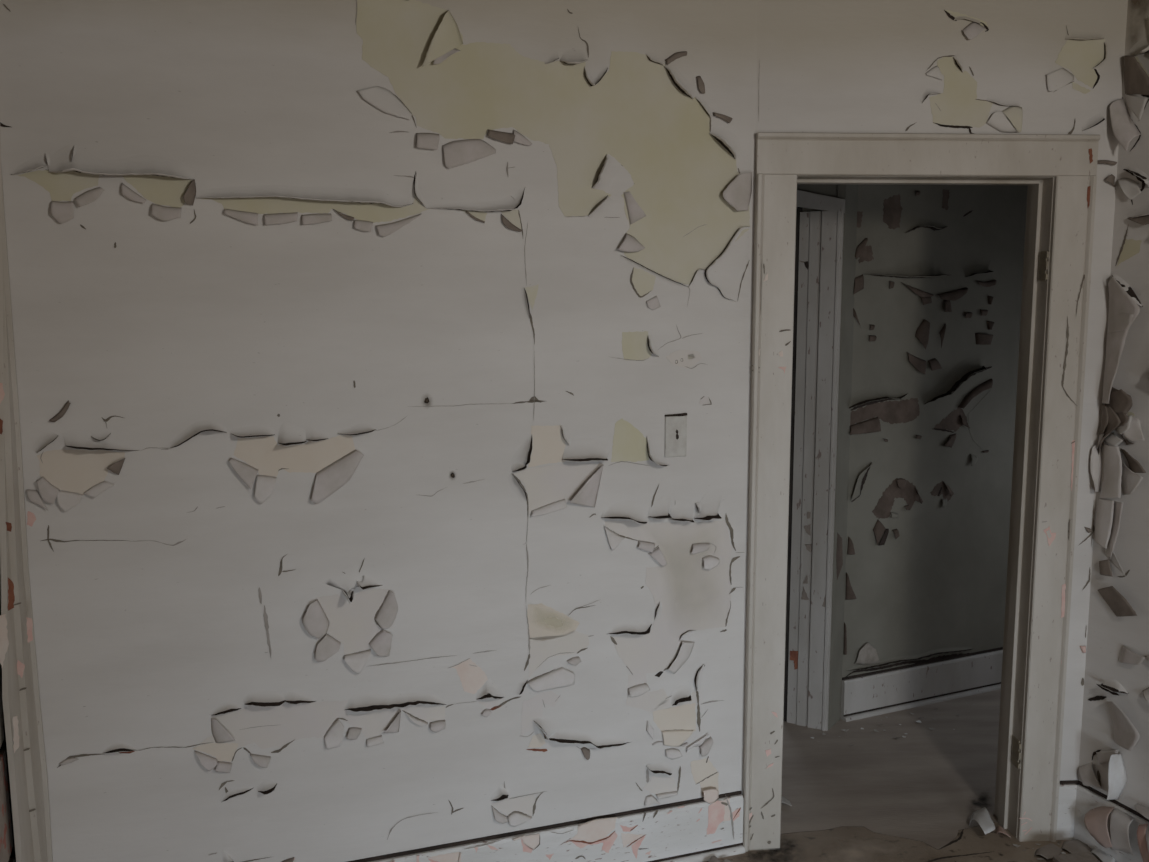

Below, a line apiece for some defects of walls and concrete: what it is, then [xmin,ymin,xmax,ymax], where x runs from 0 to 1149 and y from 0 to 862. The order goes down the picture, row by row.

peeling [10,143,525,237]
peeling [355,0,768,310]
peeling [920,53,1023,134]
peeling [1068,18,1149,152]
crack [408,224,545,408]
peeling [849,211,996,466]
peeling [1068,148,1149,617]
crack [41,506,225,552]
peeling [26,401,407,527]
crack [523,504,531,586]
peeling [57,419,775,862]
peeling [1078,678,1149,800]